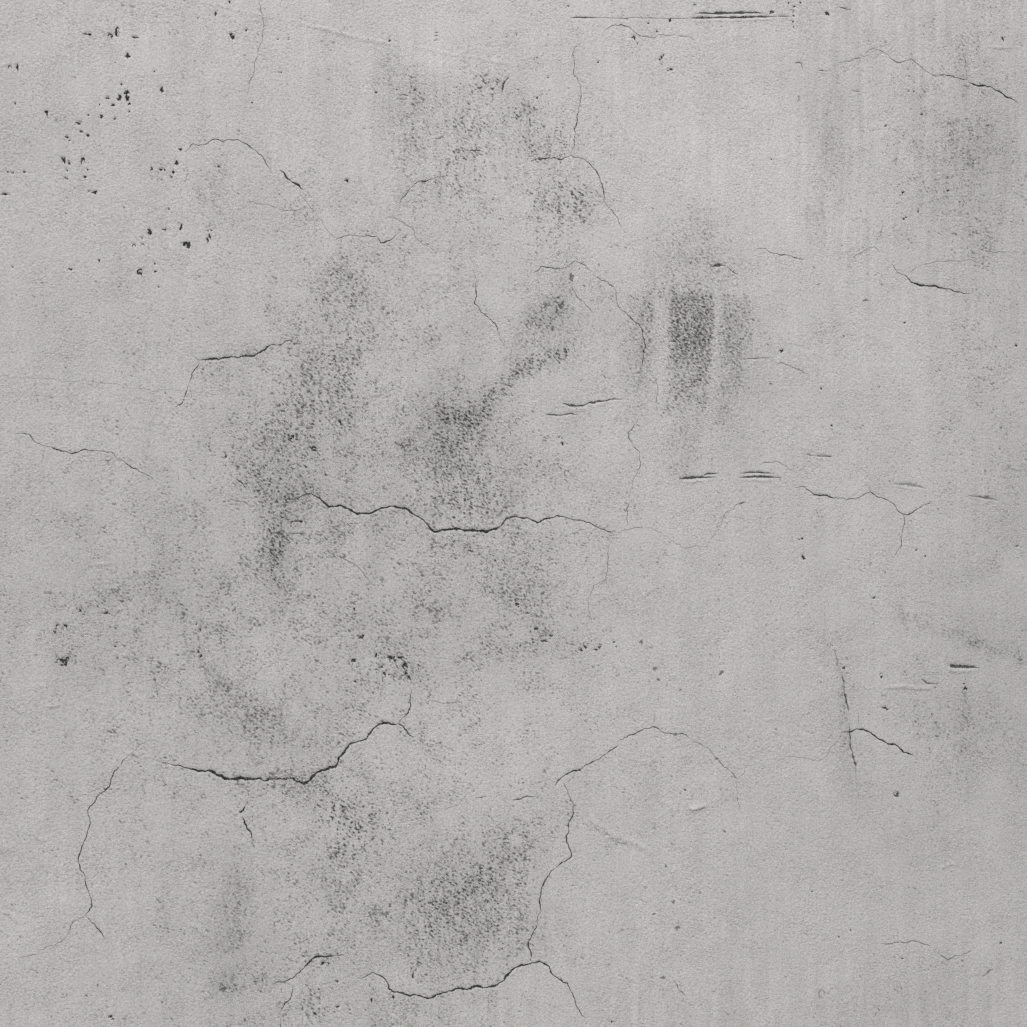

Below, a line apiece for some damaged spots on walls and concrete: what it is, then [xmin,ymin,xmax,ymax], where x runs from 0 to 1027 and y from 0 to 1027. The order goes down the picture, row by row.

leakage [671,292,713,381]
leakage [417,352,560,518]
crack [283,262,745,623]
crack [760,461,932,555]
crack [777,713,914,761]
crack [19,691,457,958]
crack [275,711,748,1027]